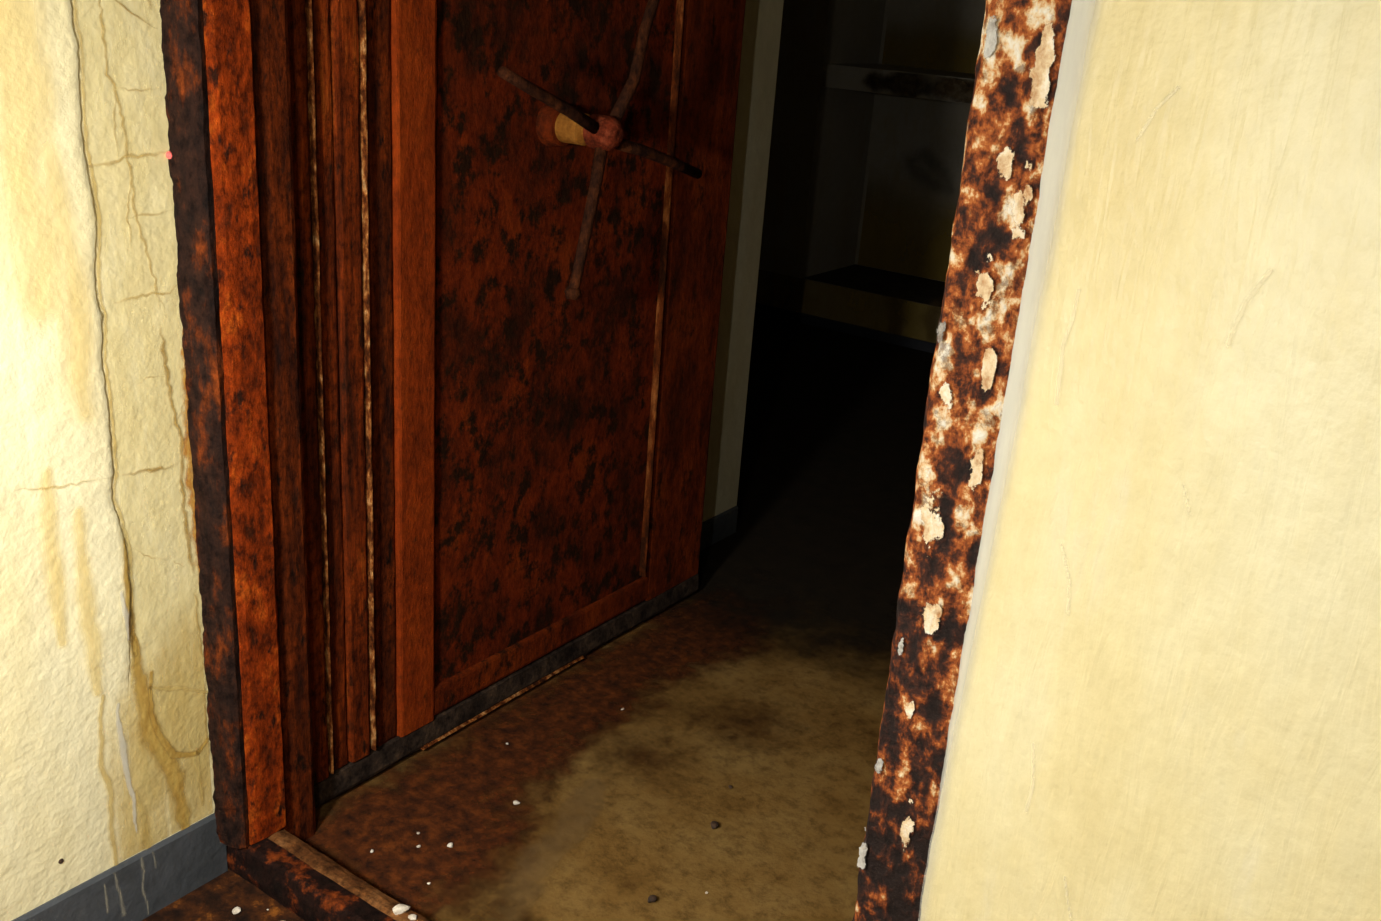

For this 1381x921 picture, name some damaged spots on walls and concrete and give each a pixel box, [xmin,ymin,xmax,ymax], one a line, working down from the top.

leakage [0,0,87,396]
crack [99,0,160,294]
crack [142,339,191,560]
leakage [78,511,211,916]